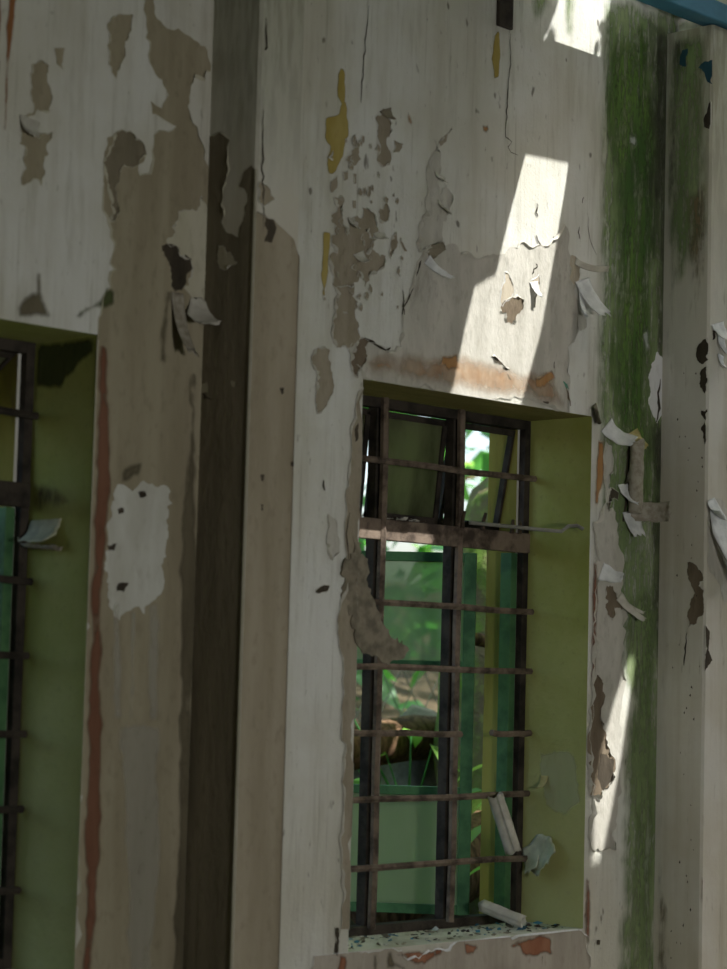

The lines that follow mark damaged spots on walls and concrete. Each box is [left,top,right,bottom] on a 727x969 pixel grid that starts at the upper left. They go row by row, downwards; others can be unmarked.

rust [0,0,16,62]
peeling [18,518,63,551]
peeling [19,48,65,186]
rust [83,347,110,969]
peeling [74,0,301,969]
peeling [310,583,600,969]
peeling [311,108,611,561]
leakage [629,569,672,969]
leakage [607,28,704,503]
peeling [684,497,727,671]
flaking render [703,100,712,130]
flaking render [696,321,727,394]